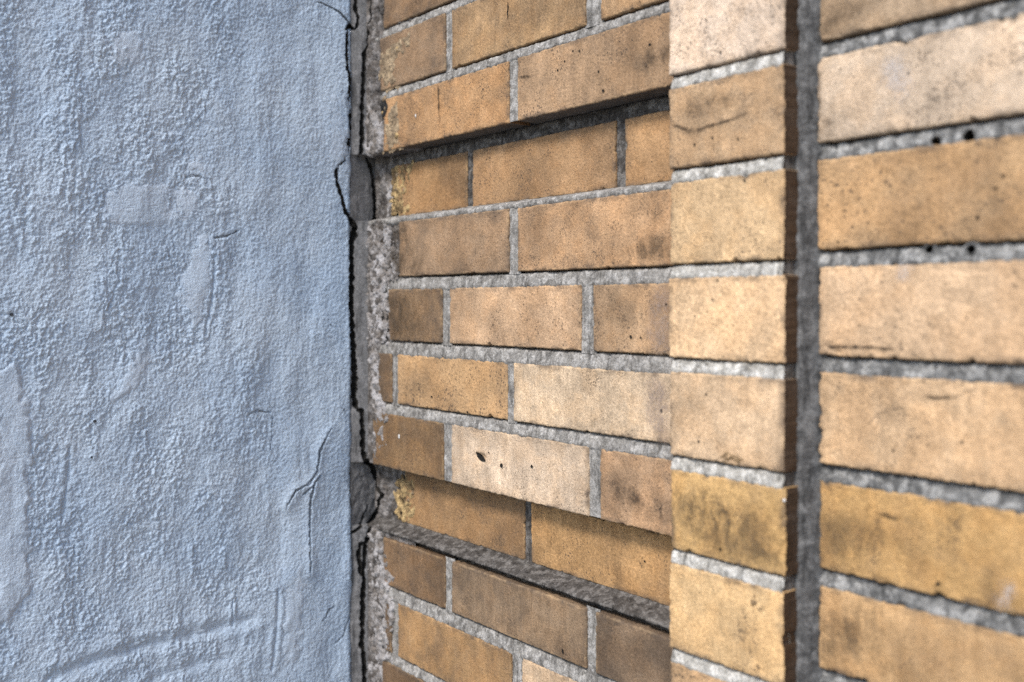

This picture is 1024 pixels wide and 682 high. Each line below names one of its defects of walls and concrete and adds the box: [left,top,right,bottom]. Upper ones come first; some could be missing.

crack [287,430,331,572]
crack [318,0,385,682]